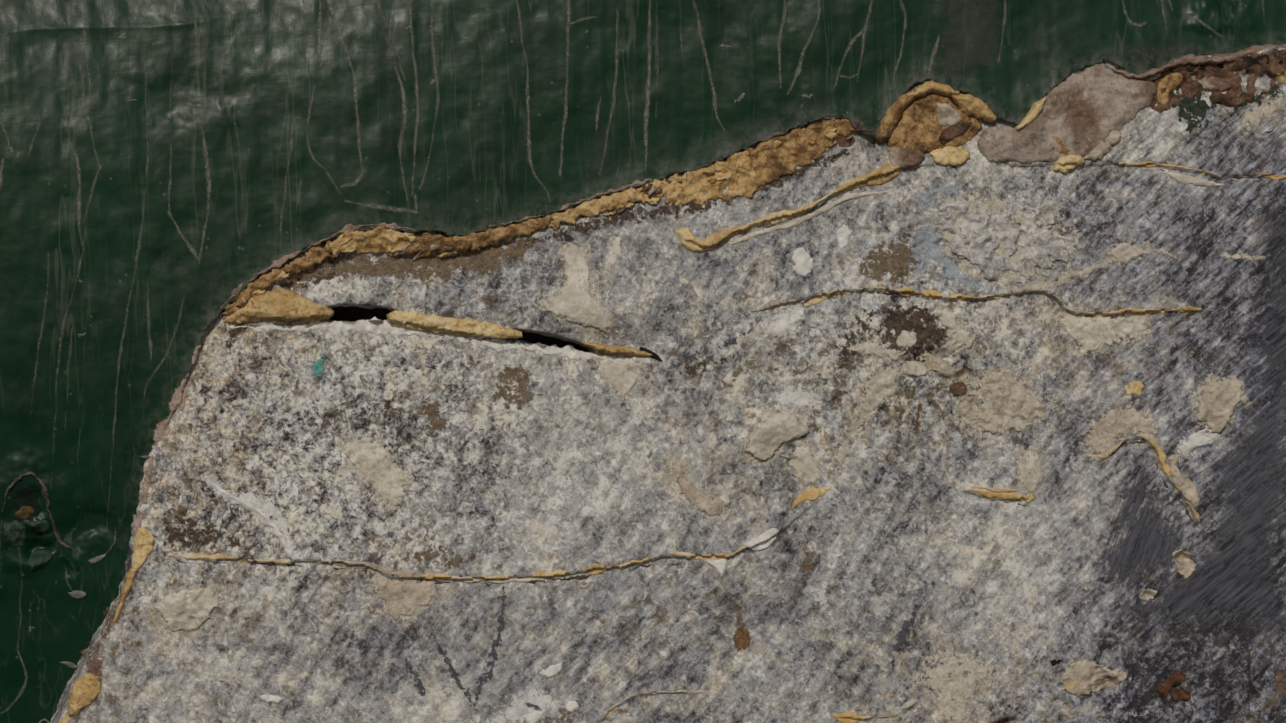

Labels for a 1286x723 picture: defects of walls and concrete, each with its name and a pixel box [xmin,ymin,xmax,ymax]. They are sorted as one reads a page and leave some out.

peeling [1098,44,1286,106]
peeling [394,243,411,262]
crack [229,306,662,365]
peeling [896,330,917,348]